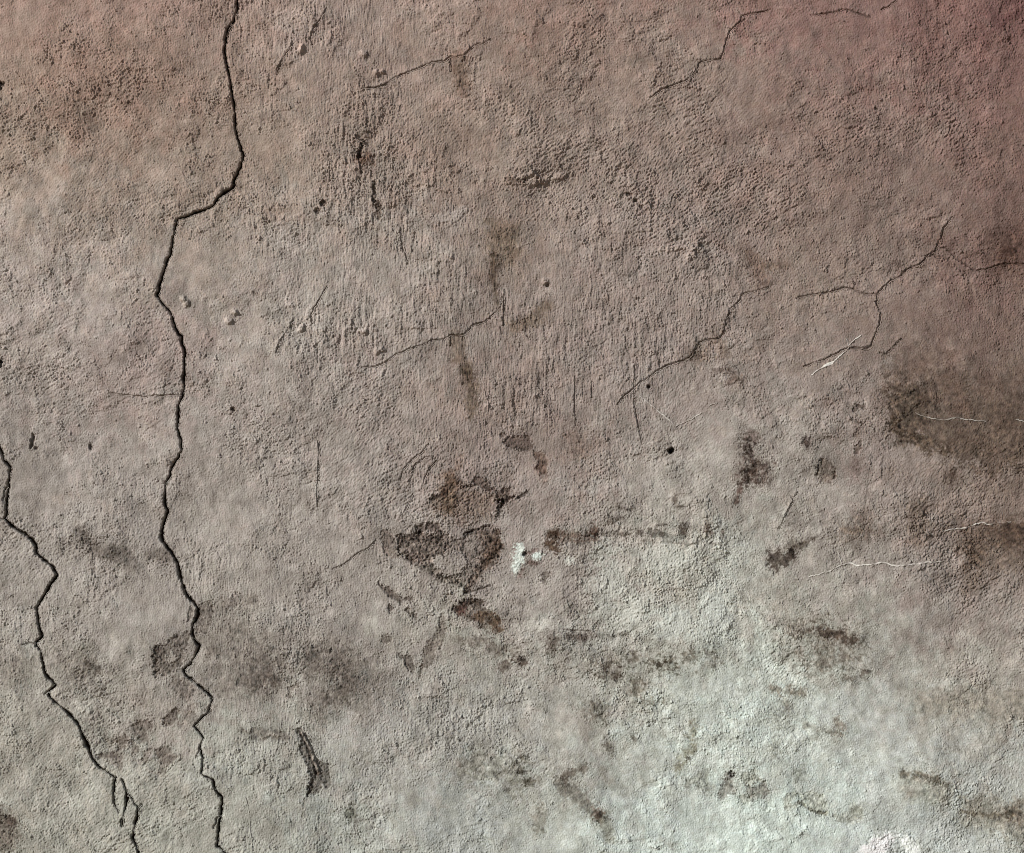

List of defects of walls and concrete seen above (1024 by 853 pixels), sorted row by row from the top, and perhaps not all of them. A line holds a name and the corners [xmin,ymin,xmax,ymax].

crack [362,38,491,89]
crack [650,9,768,98]
crack [108,0,246,853]
crack [362,307,500,368]
leakage [420,452,499,530]
crack [617,287,768,427]
crack [797,216,1024,376]
crack [0,445,142,853]
leakage [437,492,764,848]